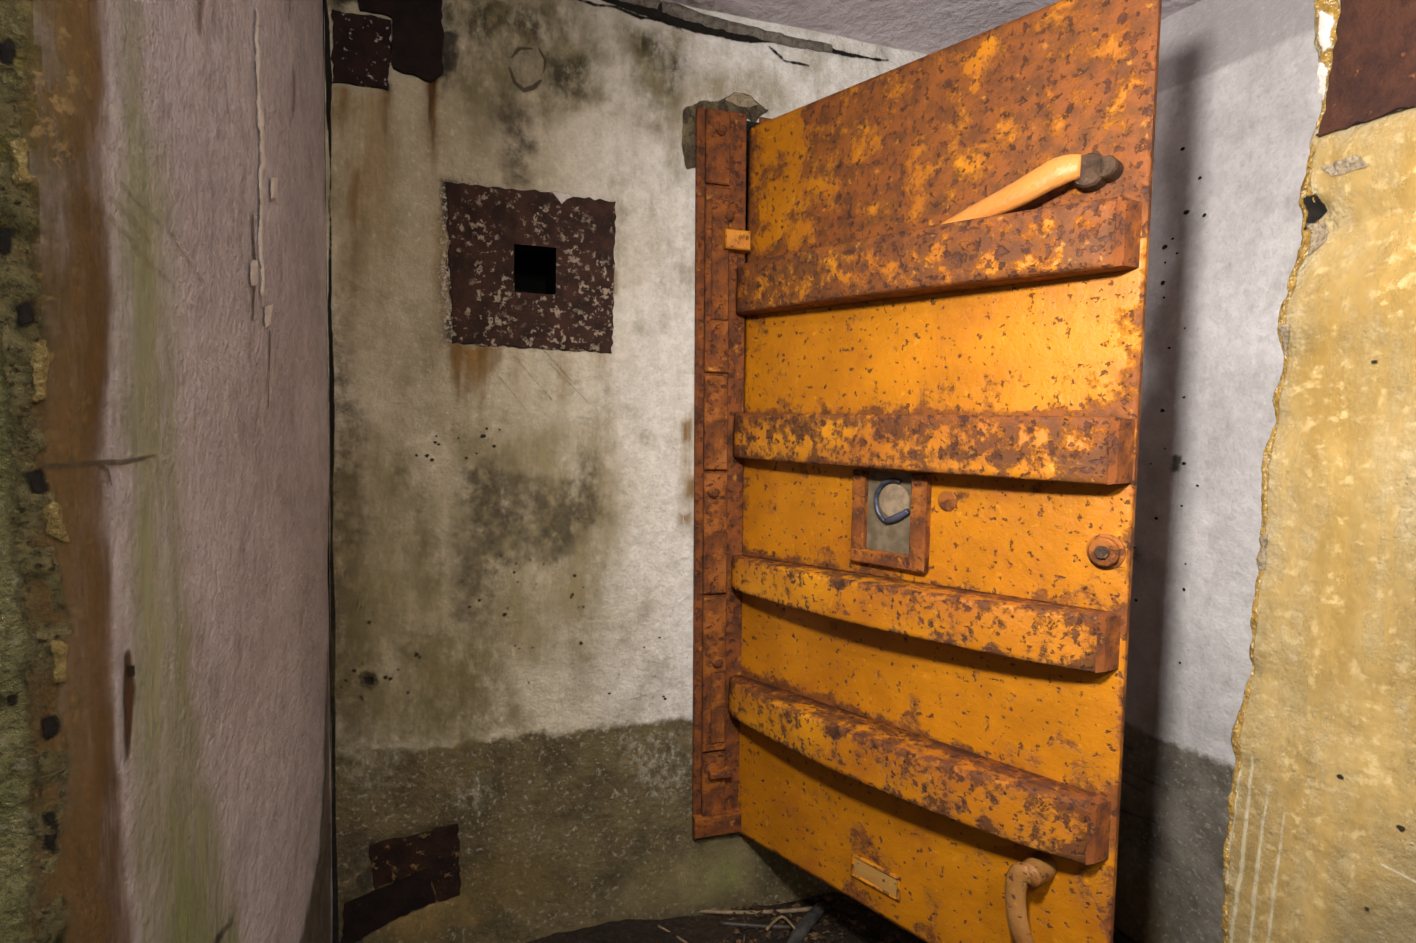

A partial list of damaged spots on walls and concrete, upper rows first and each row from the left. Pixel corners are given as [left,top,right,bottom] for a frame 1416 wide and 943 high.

leakage [442,0,588,133]
leakage [630,34,679,97]
leakage [462,431,612,619]
leakage [300,475,499,943]